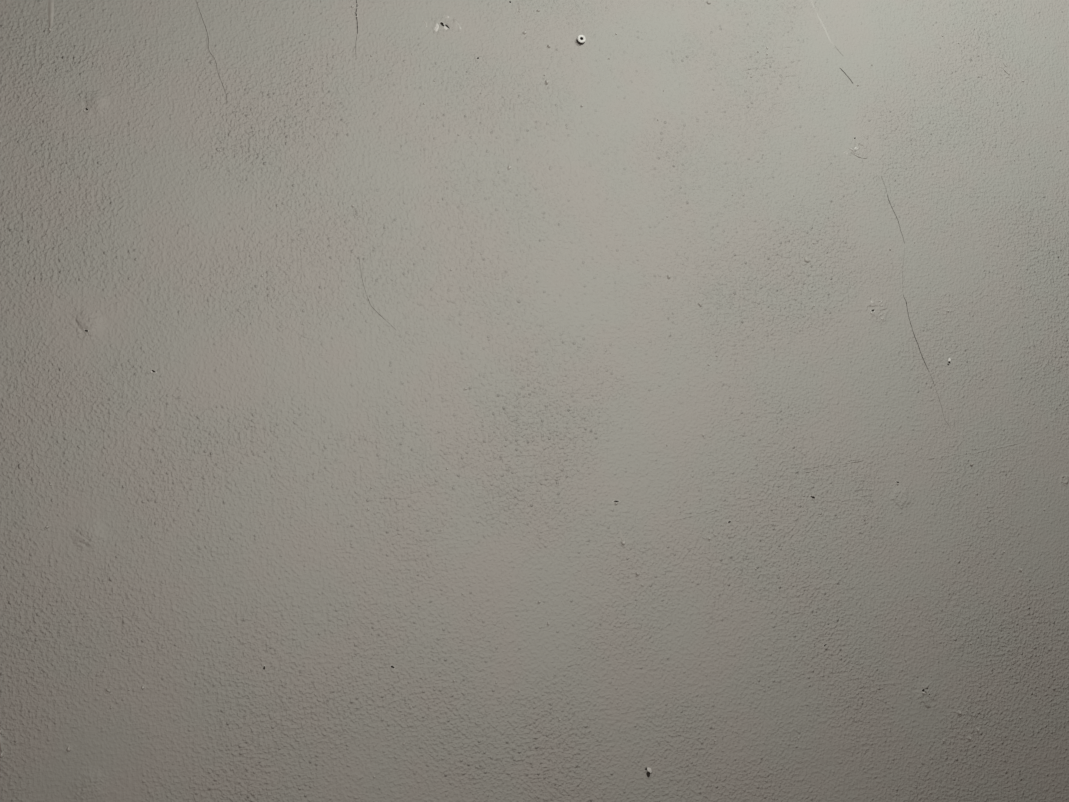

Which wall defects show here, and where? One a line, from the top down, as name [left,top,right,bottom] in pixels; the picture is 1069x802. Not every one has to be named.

crack [352,0,360,60]
crack [880,176,951,430]